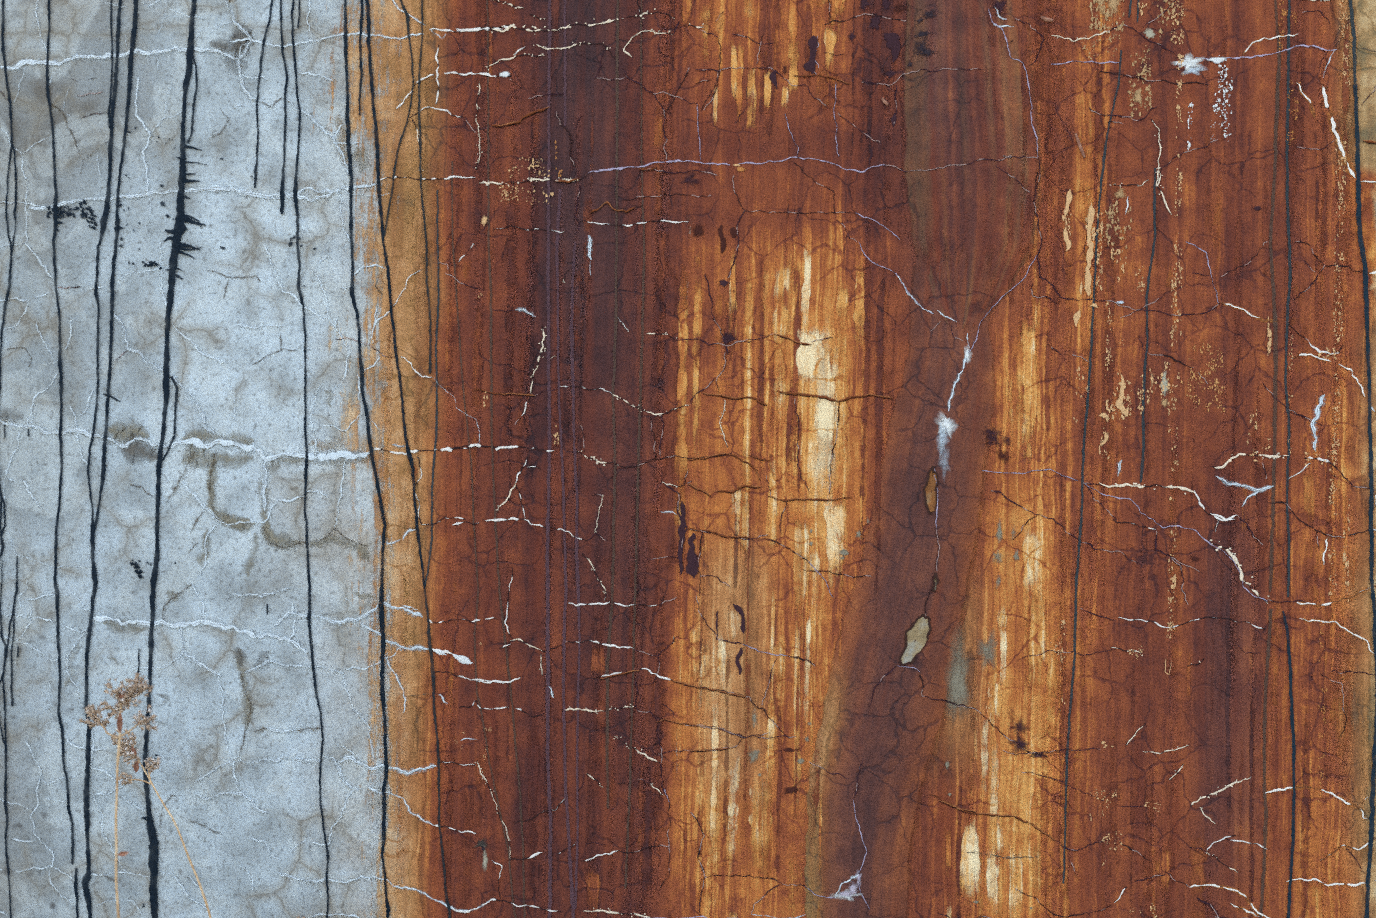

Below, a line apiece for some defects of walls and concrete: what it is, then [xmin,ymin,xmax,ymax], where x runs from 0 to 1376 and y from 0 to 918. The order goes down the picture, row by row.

water stain [210,32,252,69]
crack [0,0,1376,413]
water stain [109,425,157,460]
water stain [237,648,252,728]
water stain [182,432,369,562]
crack [0,243,891,918]
corrosion [313,0,917,918]
spalling [899,614,932,666]
spalling [923,465,938,515]
crack [869,665,1376,918]
corrosion [906,0,1376,918]
crack [982,383,1376,735]